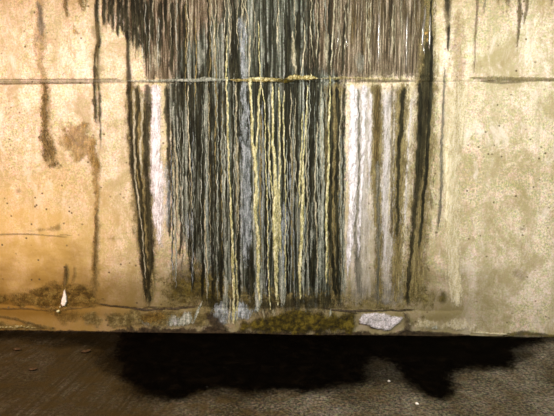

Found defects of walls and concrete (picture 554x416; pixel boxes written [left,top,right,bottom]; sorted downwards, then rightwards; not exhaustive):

leakage [517,0,529,46]
leakage [0,0,470,326]
spalling [360,313,402,330]
leakage [0,329,554,402]